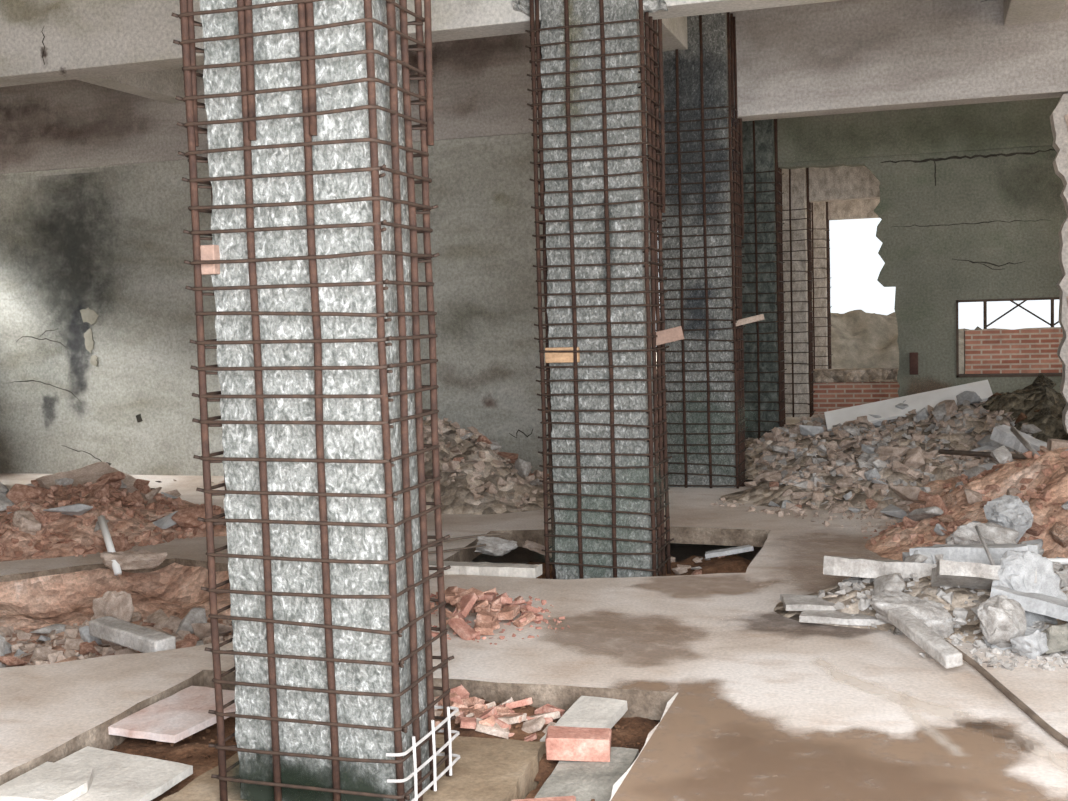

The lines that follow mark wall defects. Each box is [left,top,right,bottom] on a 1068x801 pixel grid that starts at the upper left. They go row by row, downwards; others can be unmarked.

spalling [512,0,530,17]
spalling [643,0,668,13]
crack [880,149,1056,186]
crack [893,219,1051,227]
crack [954,259,1025,270]
damp [70,306,88,389]